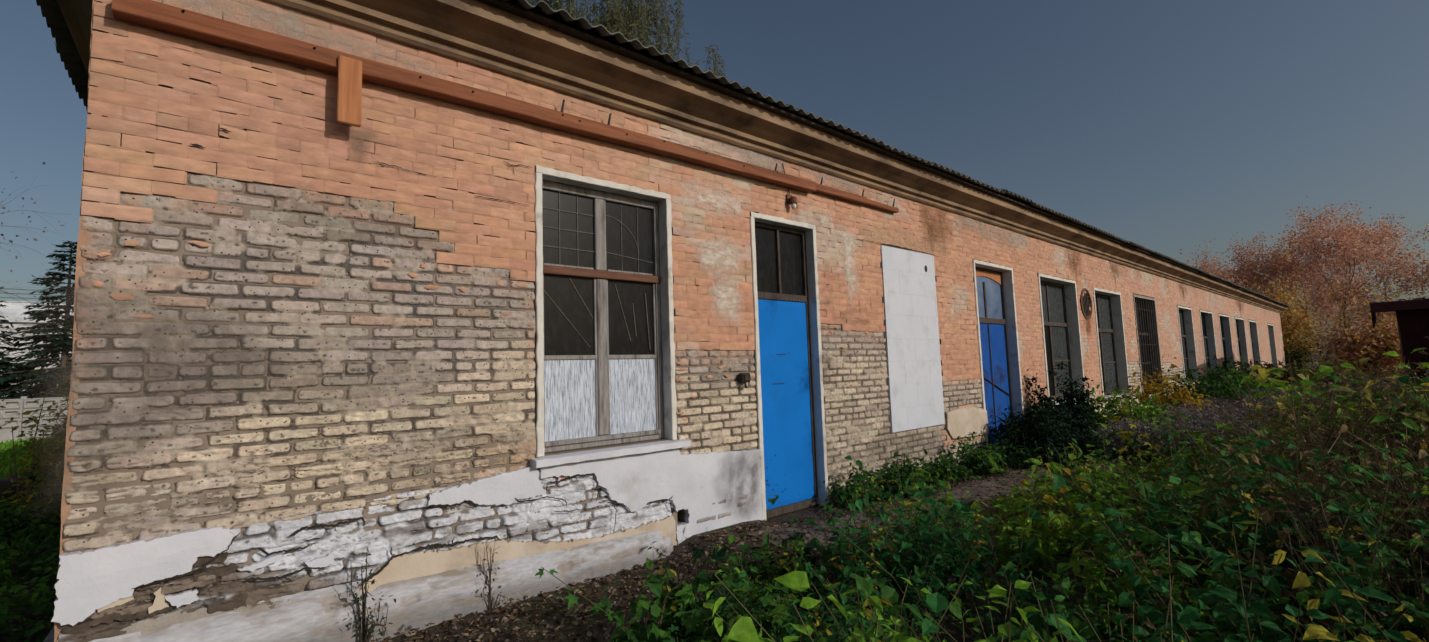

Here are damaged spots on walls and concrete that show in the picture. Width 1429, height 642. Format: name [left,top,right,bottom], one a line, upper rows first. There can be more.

peeling [56,174,674,642]